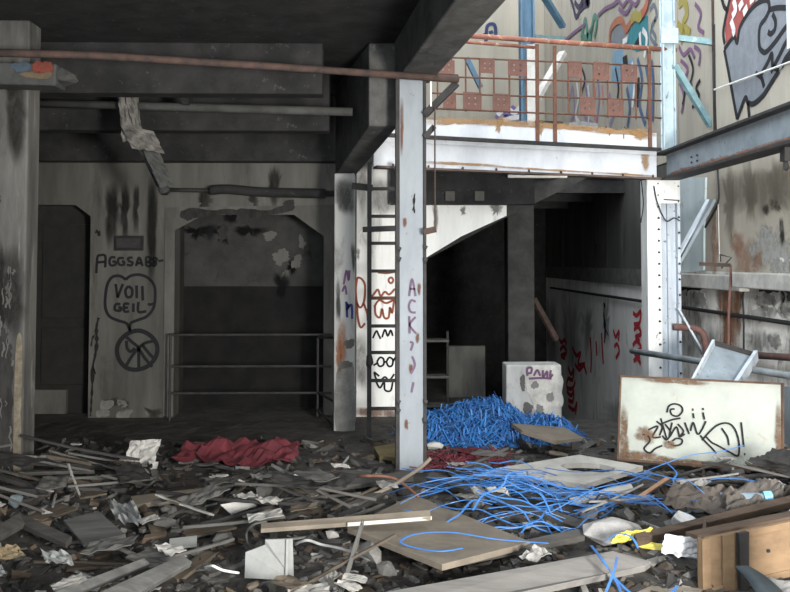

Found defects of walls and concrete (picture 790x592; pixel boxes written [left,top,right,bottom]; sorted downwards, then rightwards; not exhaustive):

water stain [7,89,25,154]
rust [436,118,648,140]
water stain [106,187,157,272]
water stain [724,171,788,235]
water stain [749,220,790,274]
water stain [0,253,22,327]
flaking render [0,266,23,454]